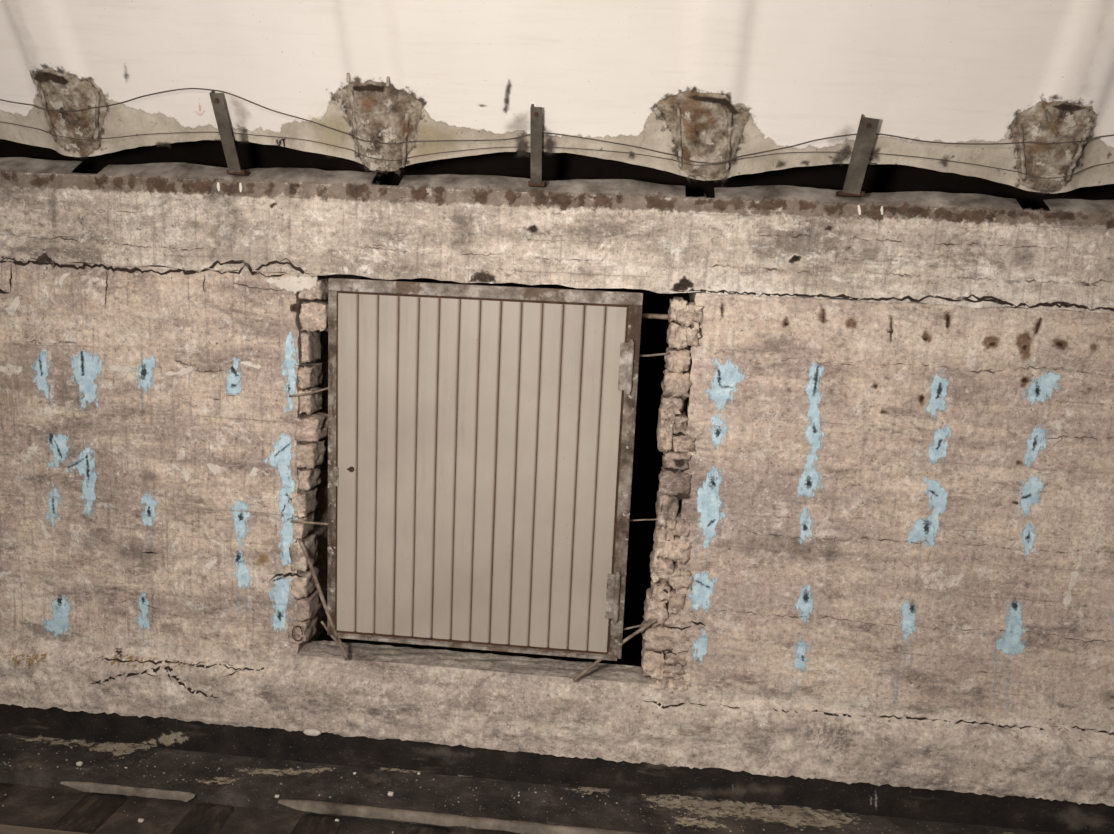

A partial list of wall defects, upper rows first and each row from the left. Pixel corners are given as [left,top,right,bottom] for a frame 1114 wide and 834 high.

spalling [0,65,855,182]
spalling [868,95,1114,194]
crack [0,236,307,304]
crack [674,264,1114,311]
rust [983,336,998,349]
rust [1016,319,1041,358]
crack [90,656,269,698]